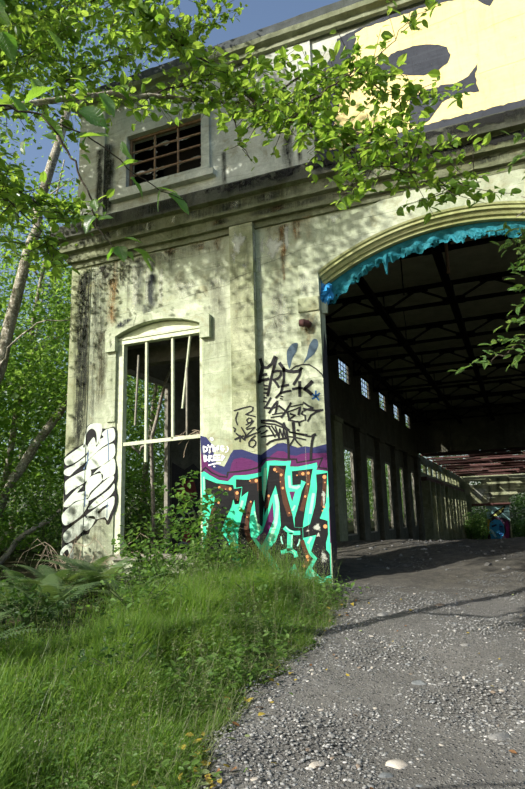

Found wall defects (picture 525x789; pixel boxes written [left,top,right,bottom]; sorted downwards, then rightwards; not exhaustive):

leakage [72,144,133,245]
leakage [142,199,179,228]
corrosion [279,221,300,259]
leakage [74,259,163,447]